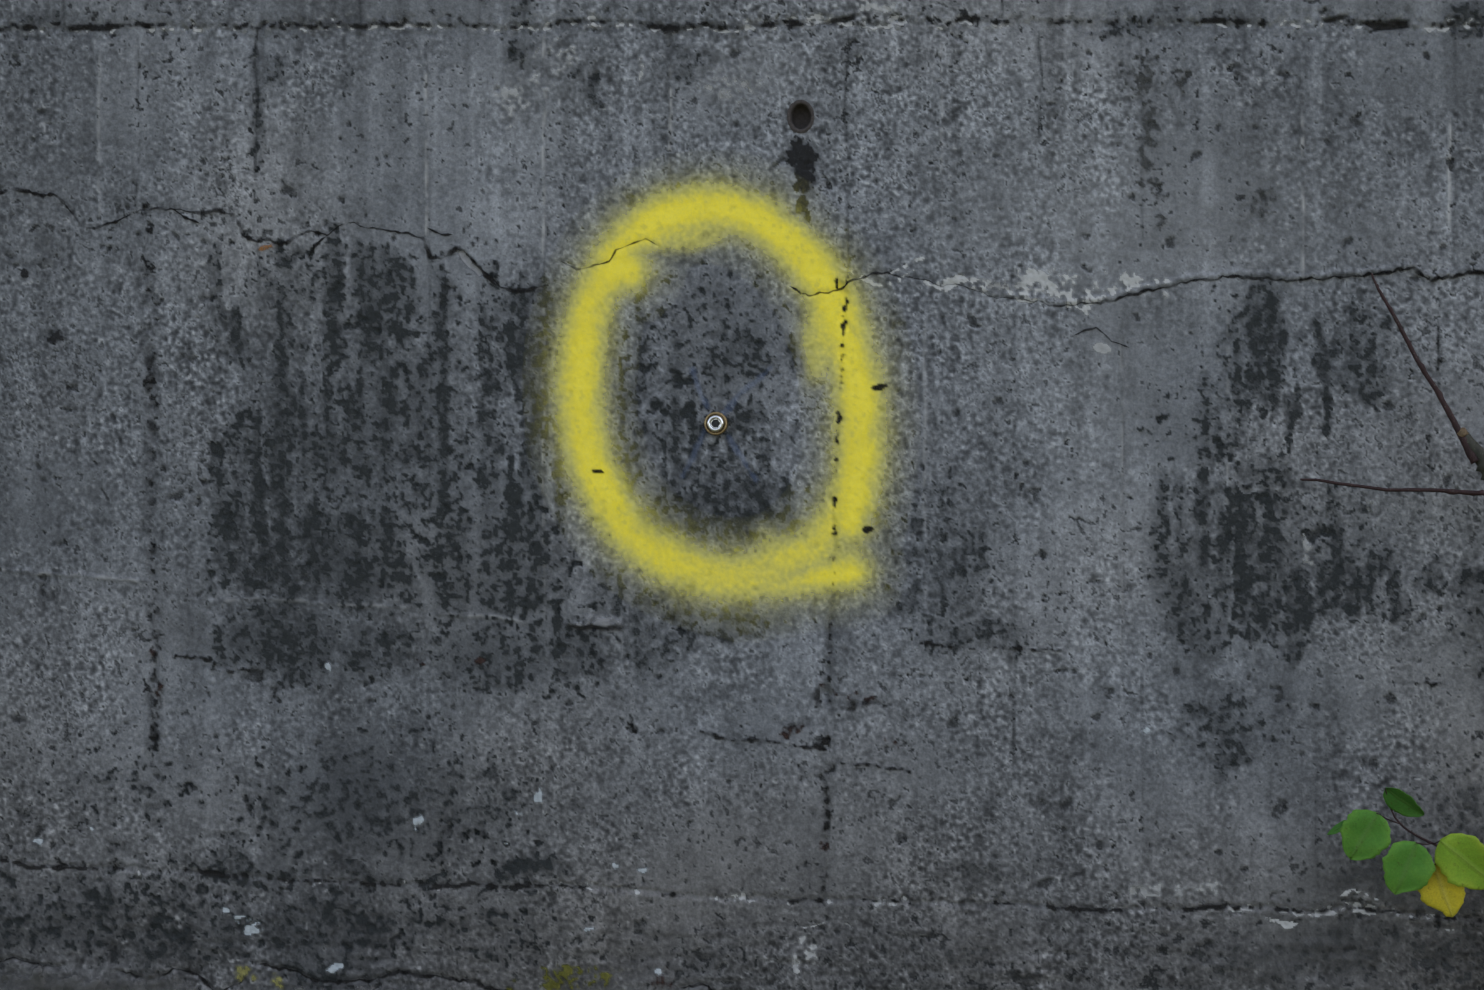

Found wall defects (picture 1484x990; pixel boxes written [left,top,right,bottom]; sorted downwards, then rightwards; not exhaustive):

crack [0,188,655,293]
leakage [204,216,810,702]
crack [790,267,1484,348]
leakage [1138,272,1484,676]